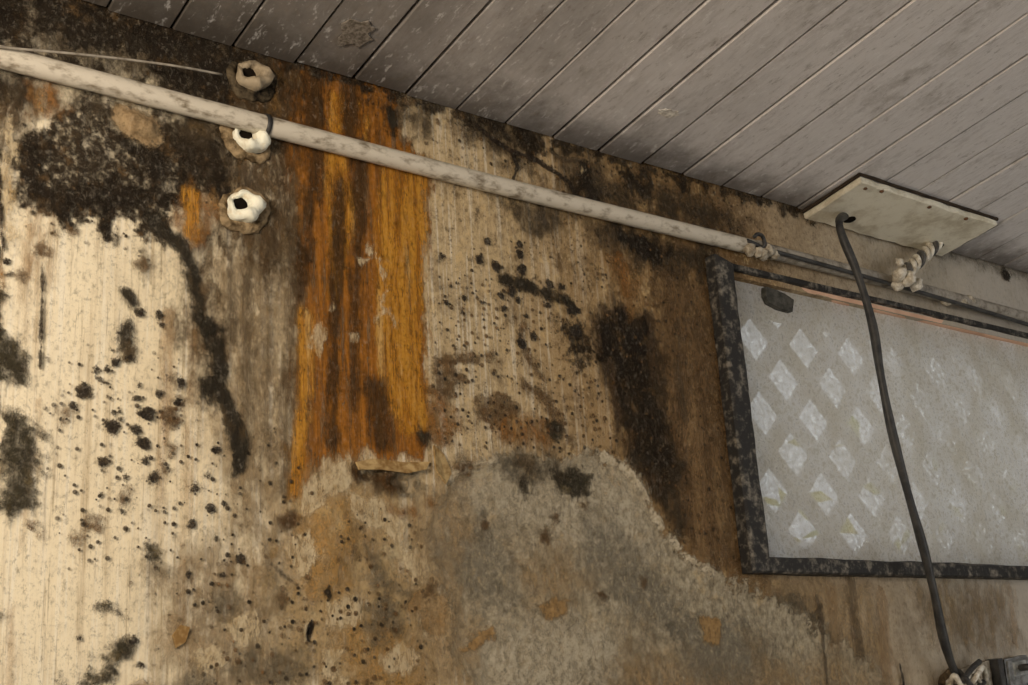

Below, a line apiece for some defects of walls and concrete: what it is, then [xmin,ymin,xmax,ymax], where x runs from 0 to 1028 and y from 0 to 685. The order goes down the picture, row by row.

corrosion [274,59,416,155]
leakage [0,0,816,236]
leakage [0,74,436,685]
corrosion [283,142,435,500]
spalling [193,425,889,685]
leakage [427,197,740,566]